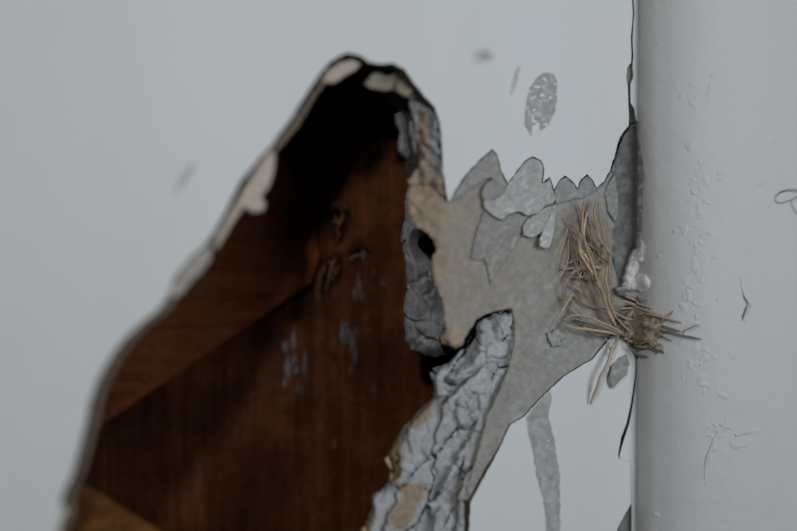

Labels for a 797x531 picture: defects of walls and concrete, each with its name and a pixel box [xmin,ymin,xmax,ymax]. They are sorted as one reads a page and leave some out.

crack [626,1,636,123]
spalling [56,57,360,531]
peeling [361,72,650,531]